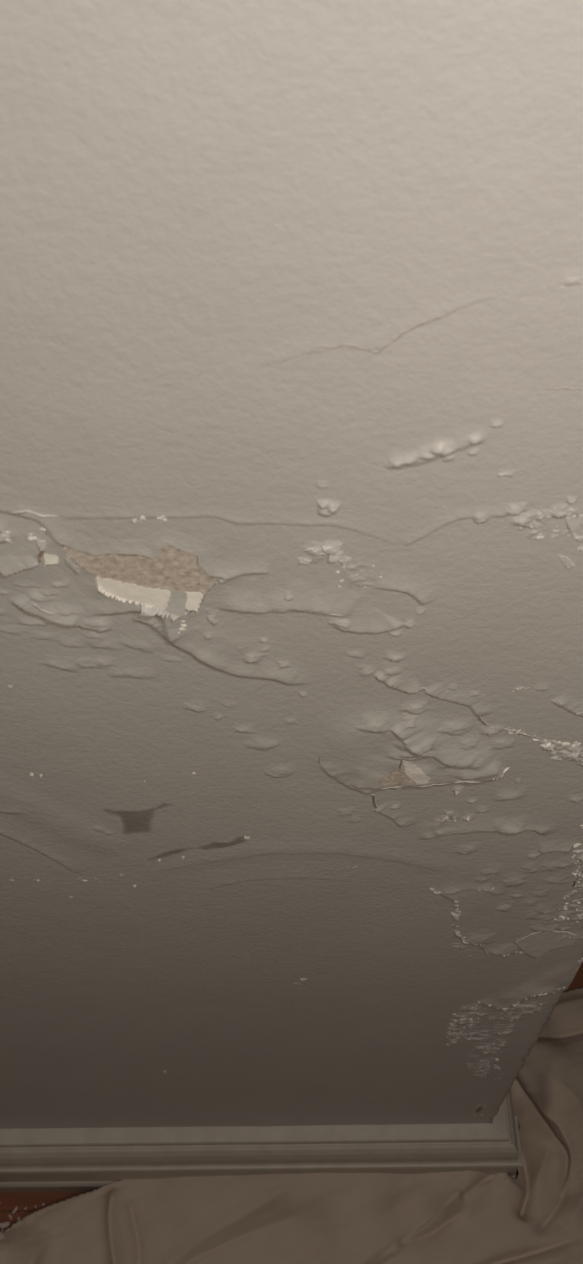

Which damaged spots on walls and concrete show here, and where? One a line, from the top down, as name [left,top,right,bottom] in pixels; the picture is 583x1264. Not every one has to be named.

peeling [0,513,271,640]
flaking render [533,739,583,766]
flaking render [553,825,583,932]
flaking render [443,958,583,1079]